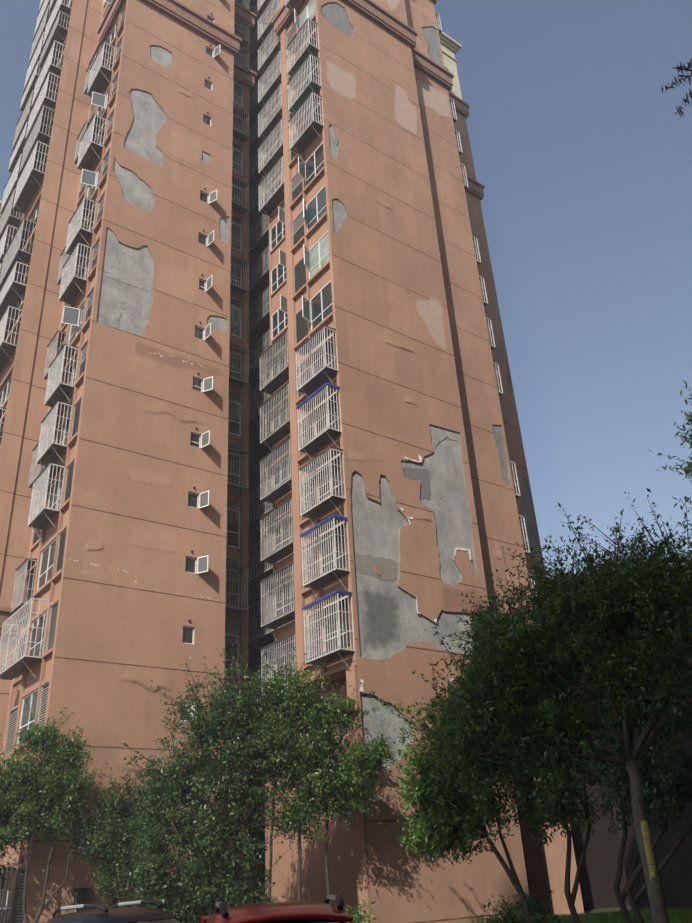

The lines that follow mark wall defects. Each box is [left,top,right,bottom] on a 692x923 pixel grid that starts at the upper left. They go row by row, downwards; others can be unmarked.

spalling [150,45,172,67]
spalling [321,2,354,38]
spalling [422,26,442,66]
spalling [124,89,167,167]
spalling [113,157,154,212]
spalling [332,198,348,232]
spalling [96,227,155,336]
spalling [401,424,477,586]
spalling [350,470,480,660]
spalling [359,680,414,775]